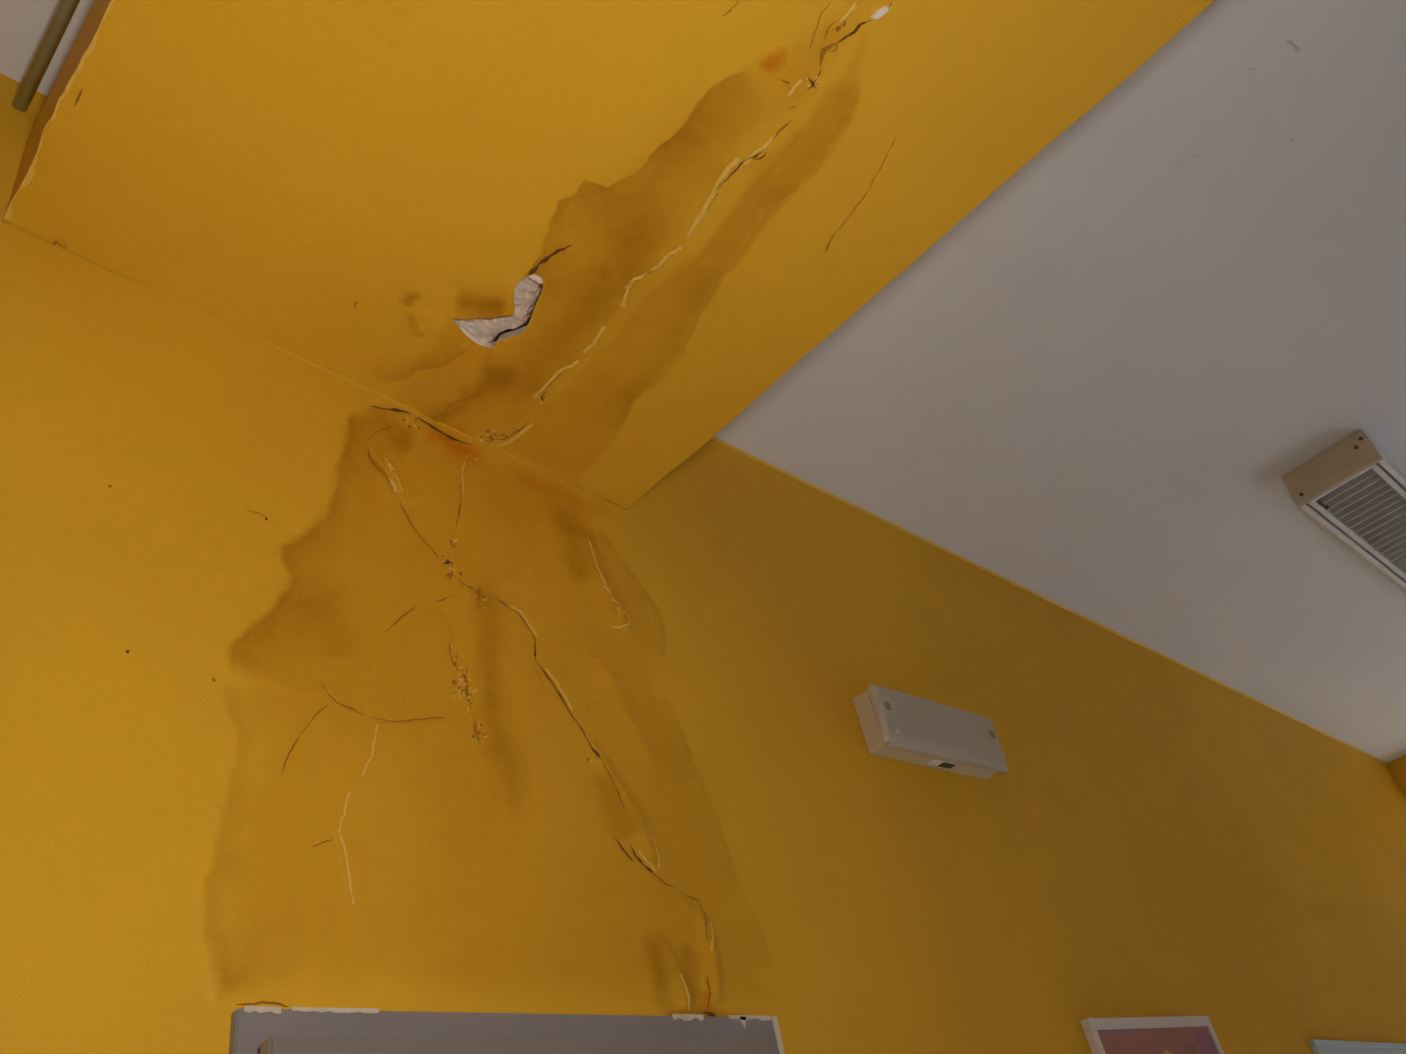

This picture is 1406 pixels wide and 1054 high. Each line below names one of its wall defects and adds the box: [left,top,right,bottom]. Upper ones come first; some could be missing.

spalling [452,245,571,348]
crack [365,2,896,941]
crack [281,643,487,775]
crack [238,1000,288,1008]
crack [703,977,717,1017]